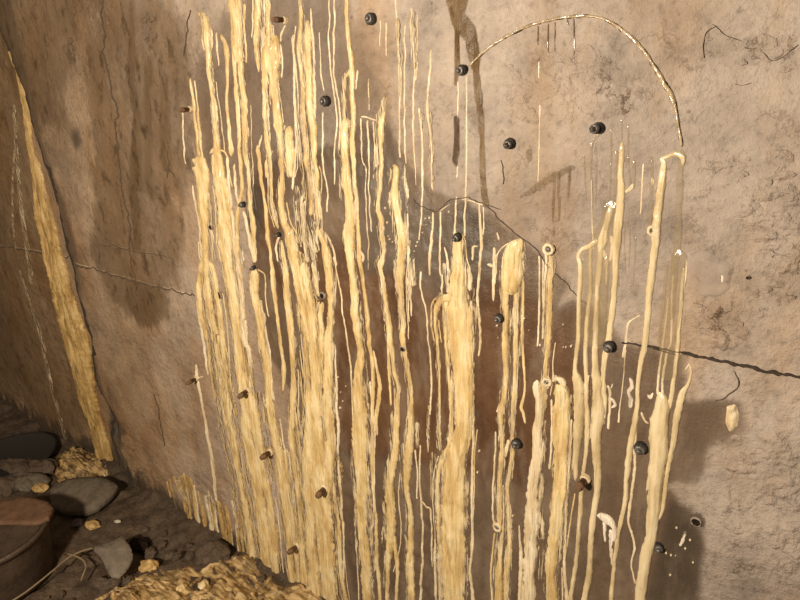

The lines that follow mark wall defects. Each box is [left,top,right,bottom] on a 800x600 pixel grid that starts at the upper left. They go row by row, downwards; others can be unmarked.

damp [0,0,64,178]
crack [469,14,683,147]
crack [0,0,195,459]
damp [166,0,740,600]
crack [414,197,587,304]
crack [621,342,800,401]